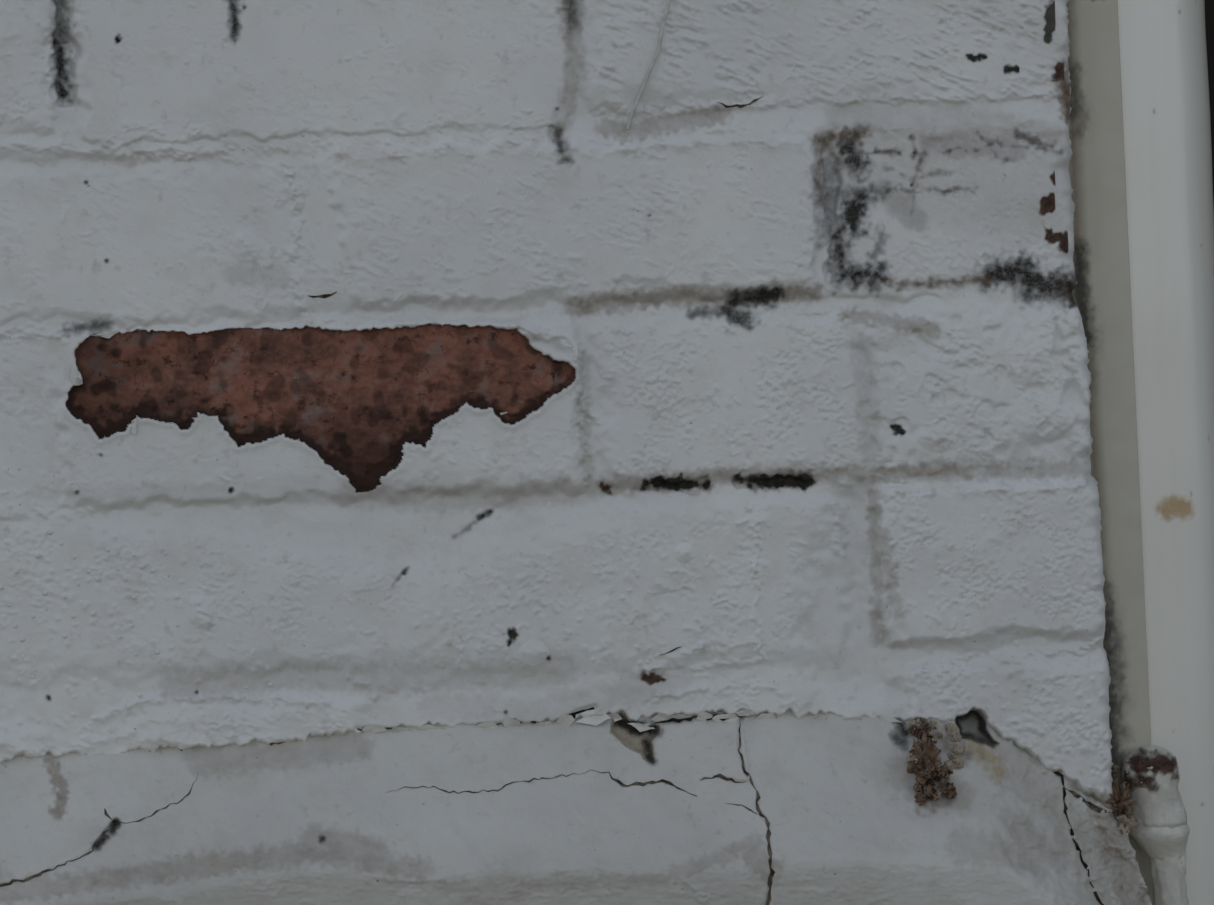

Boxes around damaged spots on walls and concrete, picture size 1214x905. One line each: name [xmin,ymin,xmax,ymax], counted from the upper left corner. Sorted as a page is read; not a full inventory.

water stain [817,127,900,171]
water stain [832,192,887,289]
water stain [902,244,1092,343]
spalling [66,324,576,492]
crack [357,724,445,733]
water stain [893,719,909,746]
spalling [955,710,999,773]
water stain [1104,606,1119,765]
crack [0,775,198,887]
crack [386,707,776,905]
crack [1054,771,1110,905]